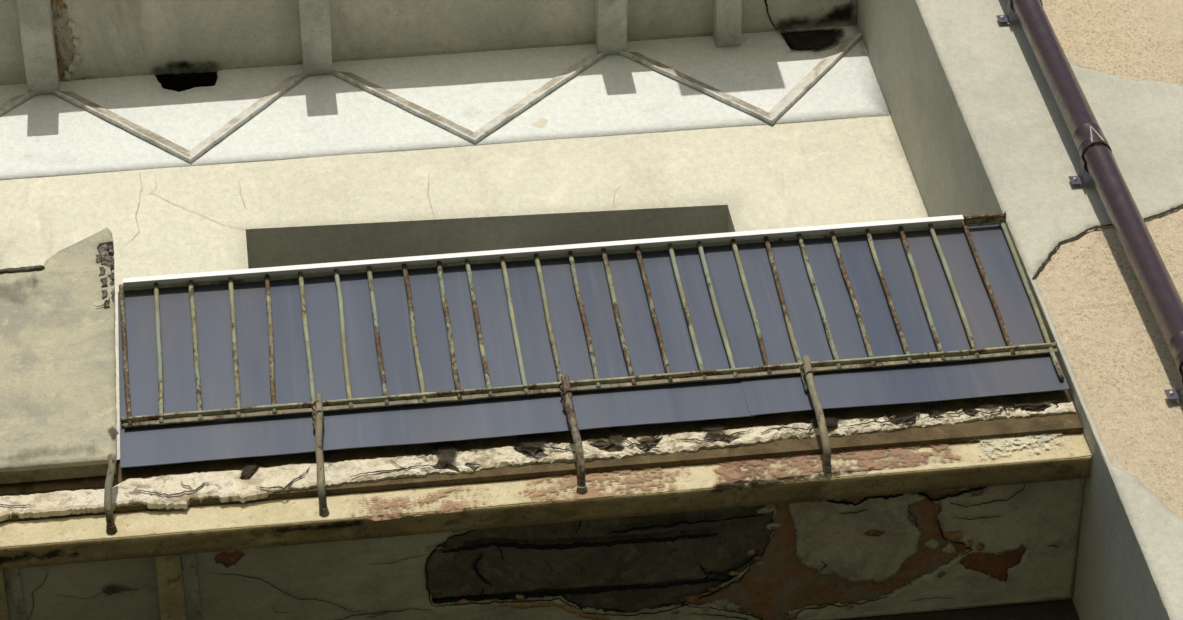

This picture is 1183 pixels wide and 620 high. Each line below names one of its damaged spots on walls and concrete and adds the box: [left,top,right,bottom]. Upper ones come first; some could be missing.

peeling [51,0,98,81]
crack [764,0,777,30]
hole [777,5,853,51]
flaking render [1042,0,1183,85]
hole [154,61,217,92]
flaking render [590,443,624,452]
flaking render [638,437,662,452]
flaking render [704,433,736,444]
flaking render [432,461,480,471]
spalling [425,488,1026,620]
crack [216,573,430,620]